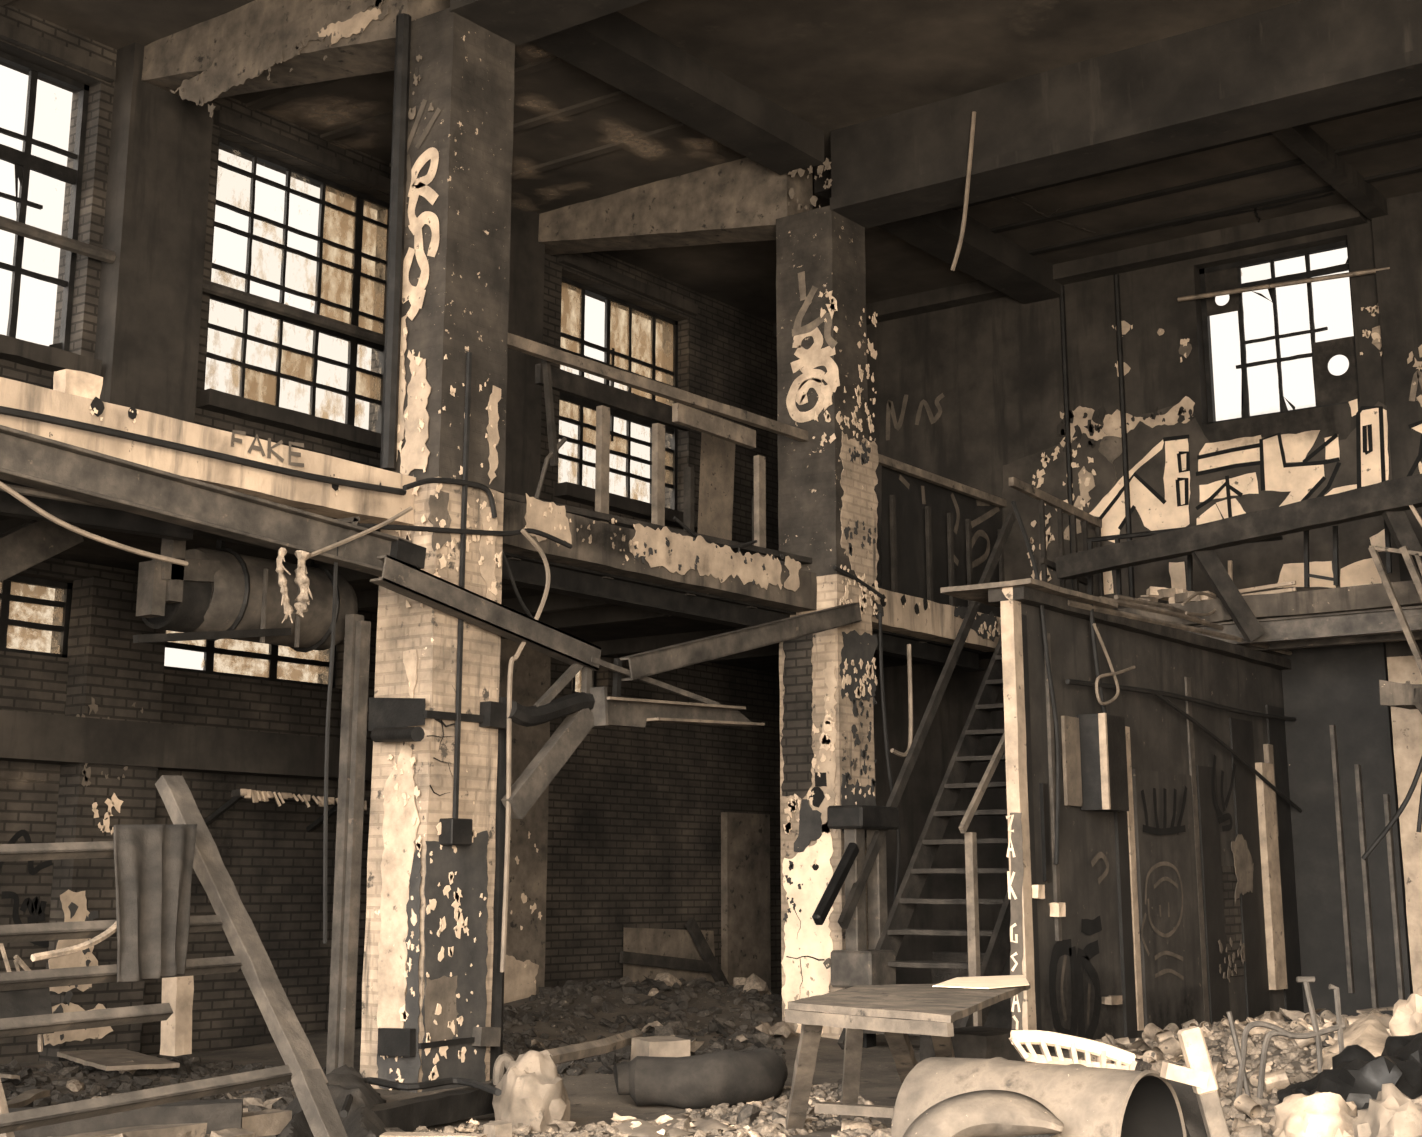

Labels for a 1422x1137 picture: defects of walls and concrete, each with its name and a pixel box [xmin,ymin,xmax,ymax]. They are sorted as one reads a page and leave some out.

peeling [170,0,389,118]
peeling [408,55,434,120]
peeling [787,158,832,210]
peeling [818,291,838,333]
peeling [1407,345,1422,407]
peeling [395,314,502,601]
peeling [1027,396,1196,581]
peeling [524,493,801,592]
peeling [403,649,418,698]
peeling [780,308,930,1033]
peeling [954,606,1000,642]
peeling [377,726,542,1093]